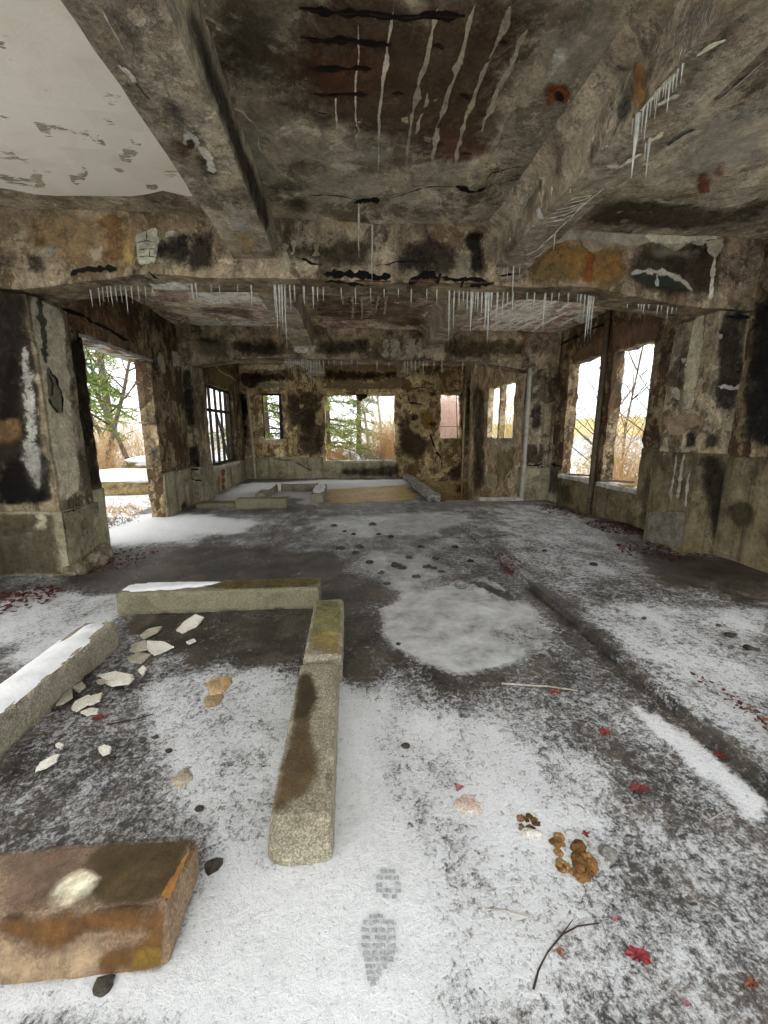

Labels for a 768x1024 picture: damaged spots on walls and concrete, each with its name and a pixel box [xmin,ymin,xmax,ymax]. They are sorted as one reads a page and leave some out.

spalling [299,6,465,23]
spalling [300,35,392,48]
damp [454,3,541,163]
rust [545,83,571,105]
peeling [34,122,68,137]
peeling [0,174,45,188]
crack [307,167,520,204]
crack [70,264,116,276]
rust [532,242,623,285]
damp [744,304,768,446]
damp [0,290,57,575]
damp [663,432,753,548]